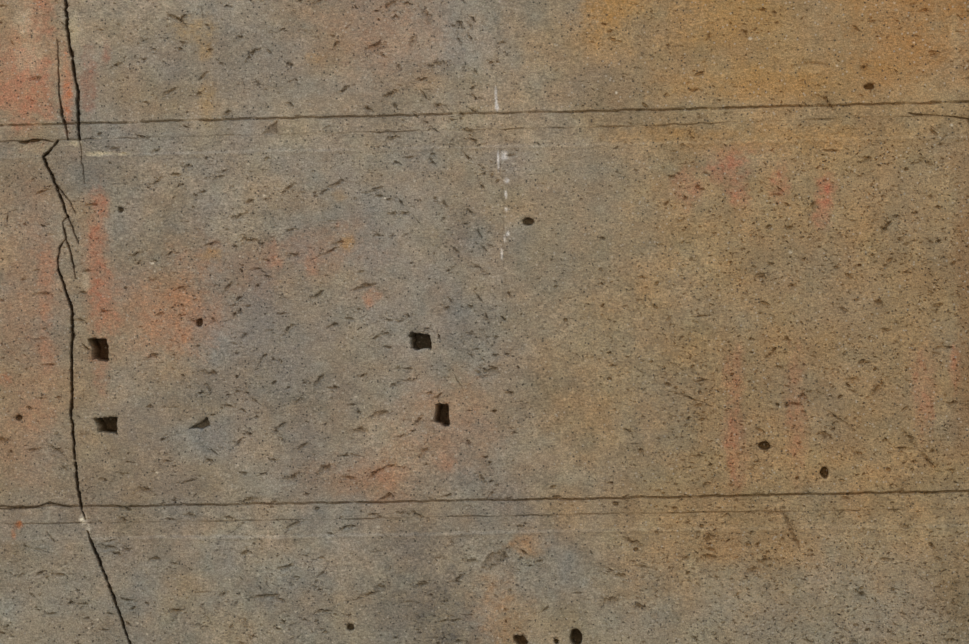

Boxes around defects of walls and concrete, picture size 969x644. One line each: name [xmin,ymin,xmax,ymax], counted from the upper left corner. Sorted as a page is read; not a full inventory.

crack [0,0,132,644]